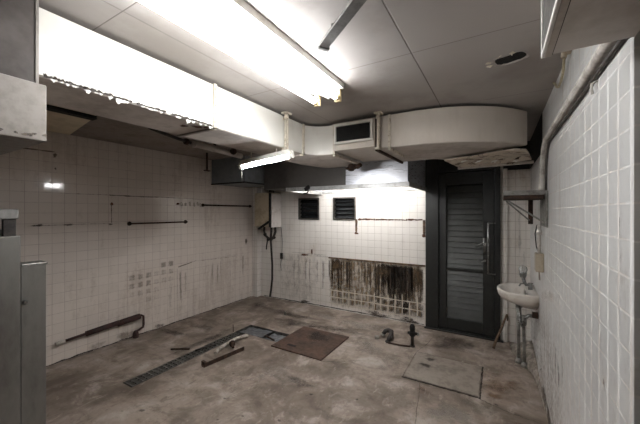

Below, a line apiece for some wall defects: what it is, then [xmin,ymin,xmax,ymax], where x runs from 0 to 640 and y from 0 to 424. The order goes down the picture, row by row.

peeling [485,50,530,68]
peeling [43,73,213,128]
peeling [444,148,534,170]
water stain [329,260,352,291]
water stain [361,264,423,303]